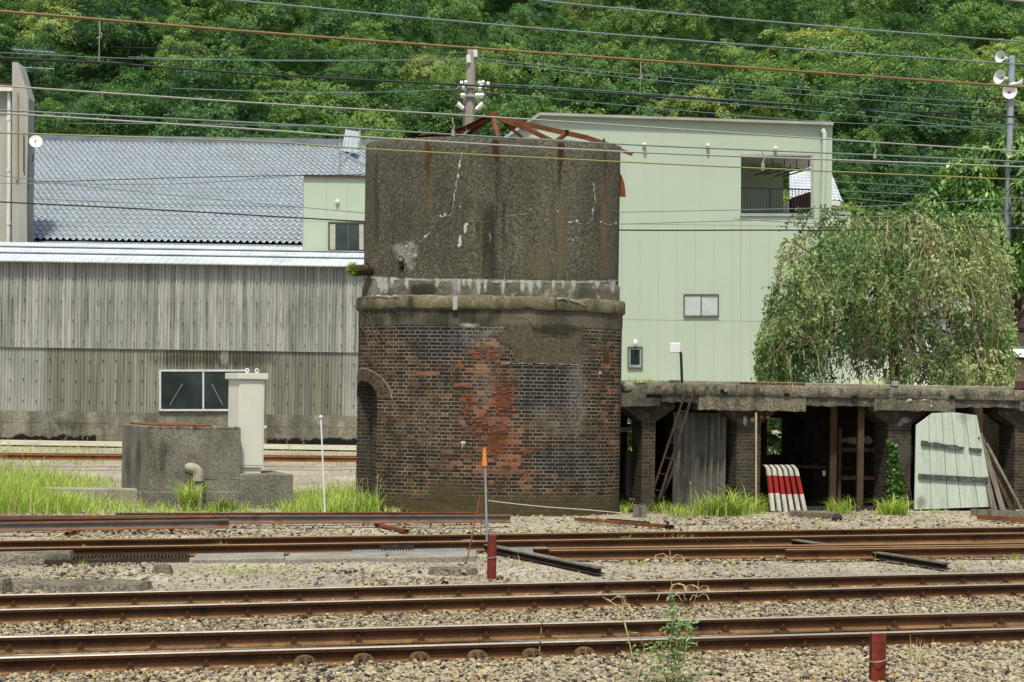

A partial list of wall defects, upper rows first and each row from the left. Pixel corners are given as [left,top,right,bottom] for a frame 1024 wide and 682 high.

crack [419,152,618,244]
spalling [393,241,418,271]
spalling [461,385,516,458]